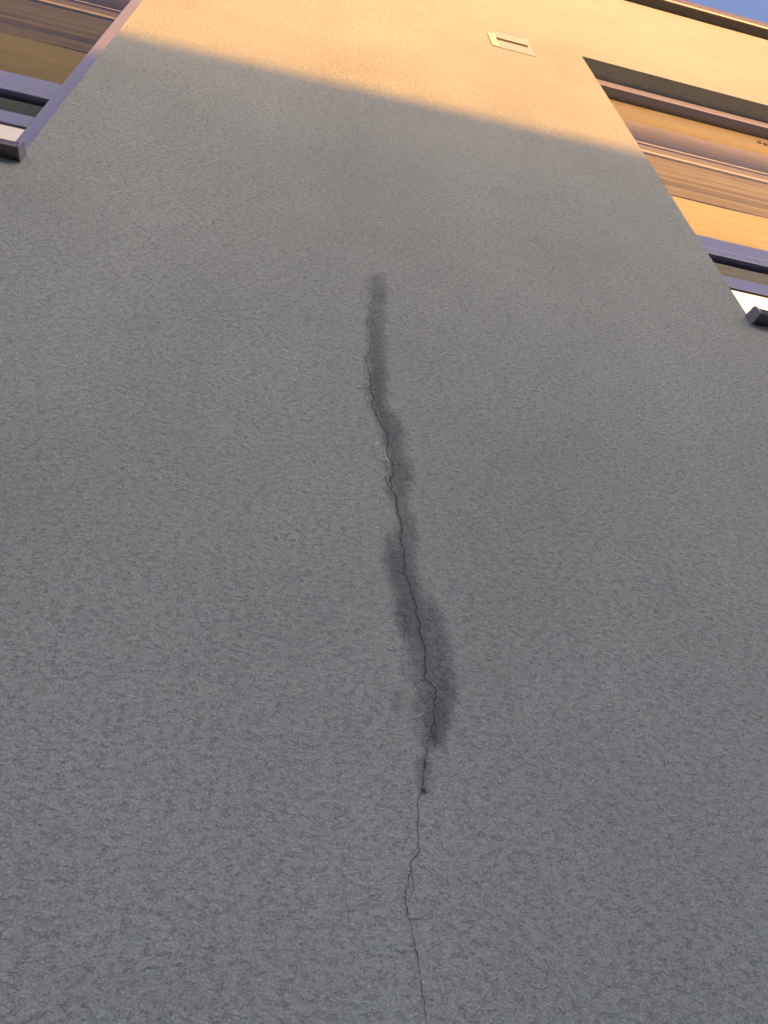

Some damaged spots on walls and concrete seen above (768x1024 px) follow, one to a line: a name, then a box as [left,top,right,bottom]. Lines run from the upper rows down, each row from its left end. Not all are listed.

crack [365,279,444,1024]